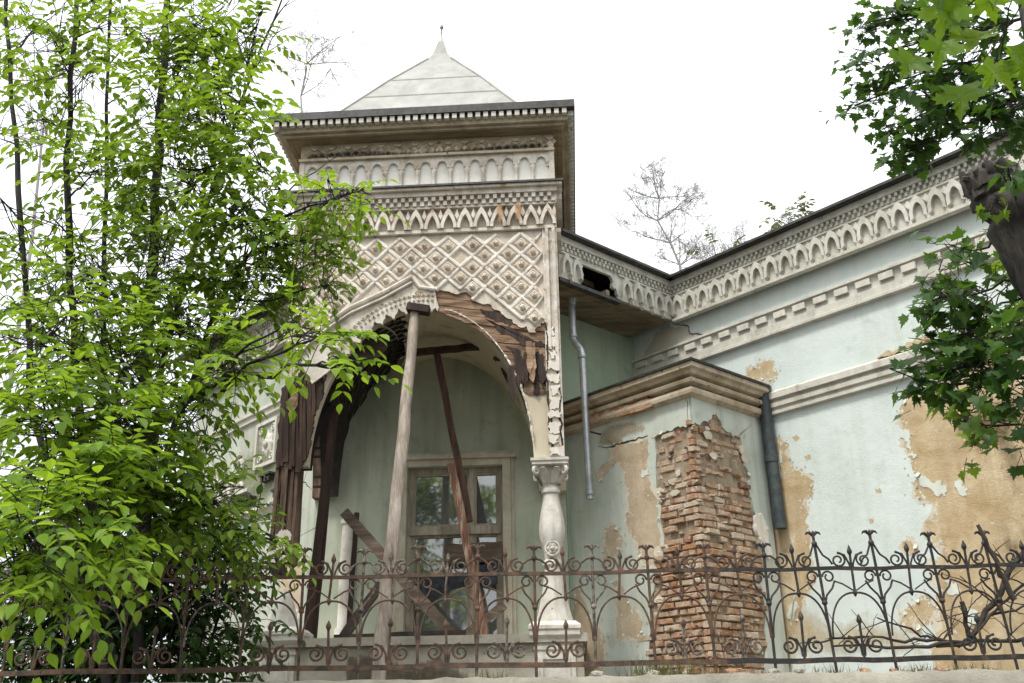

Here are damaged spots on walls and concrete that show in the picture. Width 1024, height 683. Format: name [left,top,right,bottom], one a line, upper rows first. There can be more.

flaking render [544,322,563,457]
crack [599,435,648,448]
peeling [745,358,781,386]
flaking render [573,415,822,676]
peeling [895,358,1024,671]